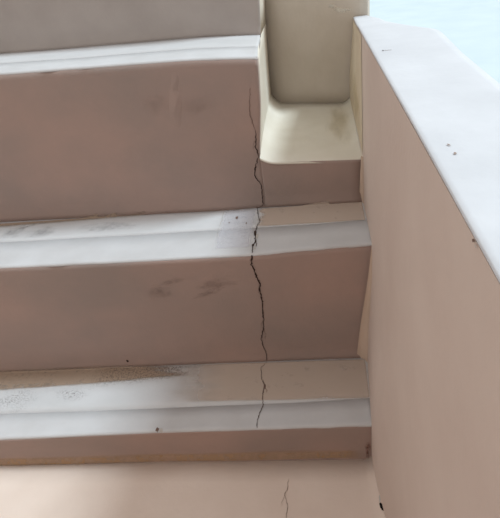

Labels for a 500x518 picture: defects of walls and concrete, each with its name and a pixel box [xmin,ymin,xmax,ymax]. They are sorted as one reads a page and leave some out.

crack [249,94,267,428]